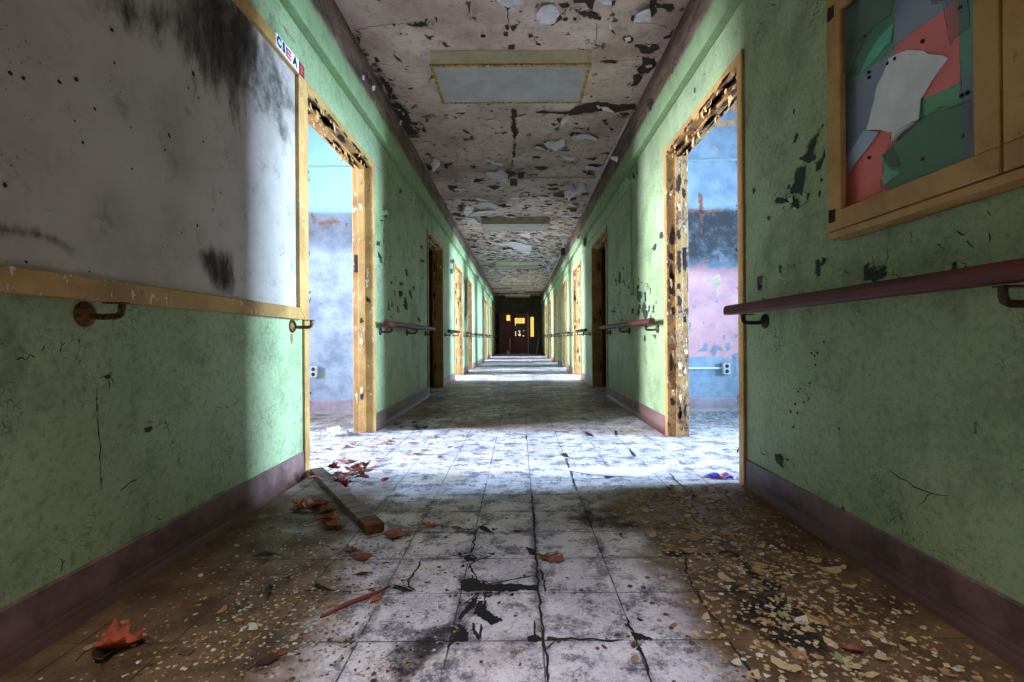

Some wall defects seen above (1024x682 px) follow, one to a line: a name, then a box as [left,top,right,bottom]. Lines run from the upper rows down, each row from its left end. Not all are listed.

leakage [153,0,257,111]
leakage [257,58,290,135]
peeling [308,98,379,174]
peeling [490,0,686,87]
peeling [667,71,737,158]
peeling [424,98,654,284]
leakage [203,249,234,290]
peeling [652,227,704,330]
crack [566,458,593,529]
crack [888,469,949,504]
crack [530,492,555,682]
leakage [391,622,458,679]